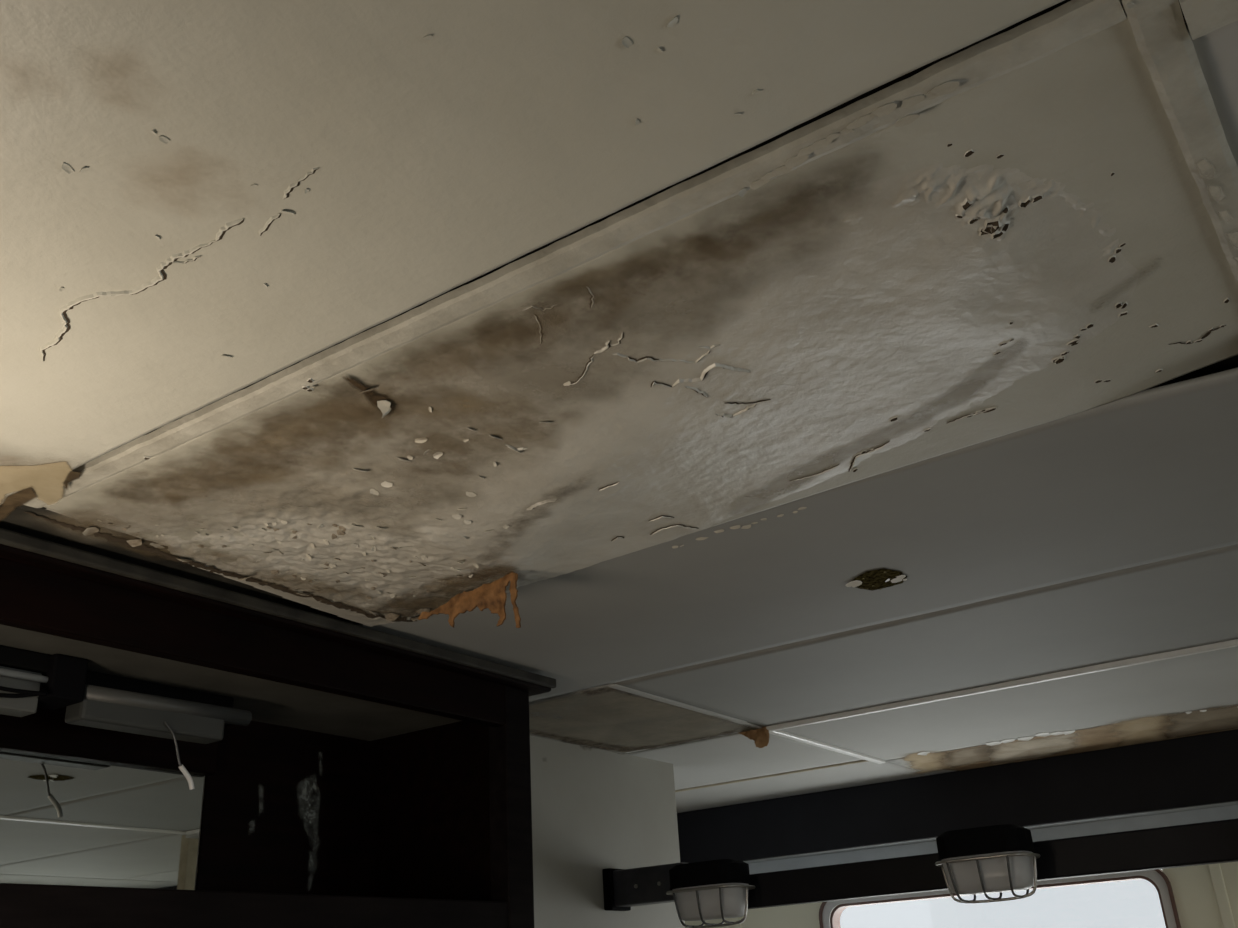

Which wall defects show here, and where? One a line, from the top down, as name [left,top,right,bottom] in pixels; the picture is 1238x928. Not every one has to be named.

spalling [823,149,1126,263]
leakage [63,327,606,530]
peeling [0,462,81,521]
leakage [529,687,753,752]